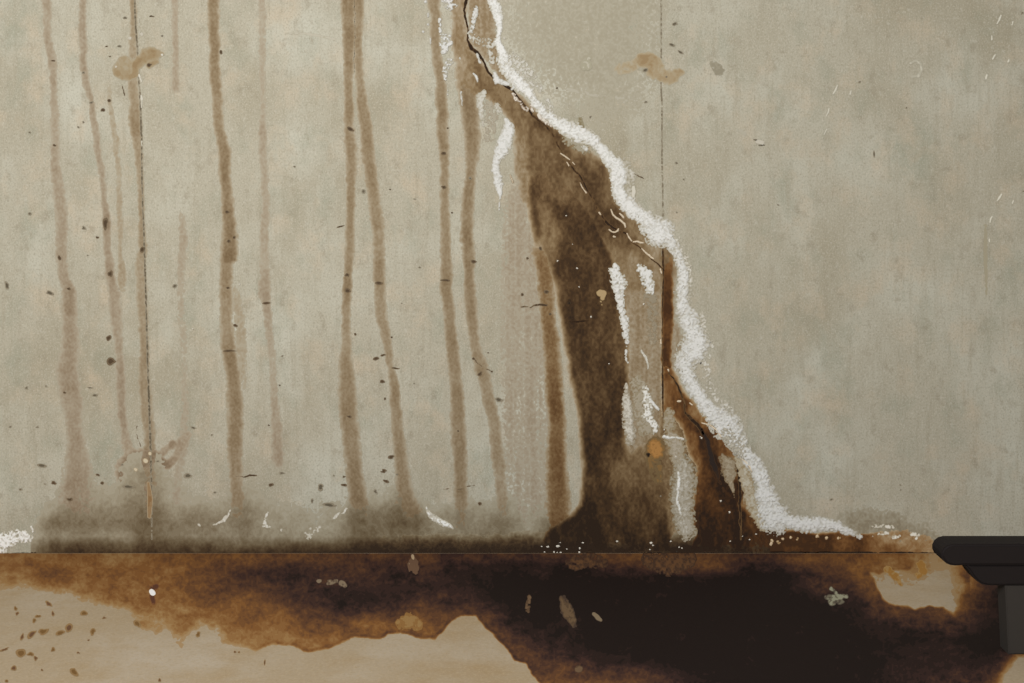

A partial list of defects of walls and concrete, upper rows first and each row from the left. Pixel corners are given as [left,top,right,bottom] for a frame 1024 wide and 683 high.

corrosion [112,46,164,82]
leakage [0,0,940,553]
corrosion [614,51,685,86]
crack [463,0,931,553]